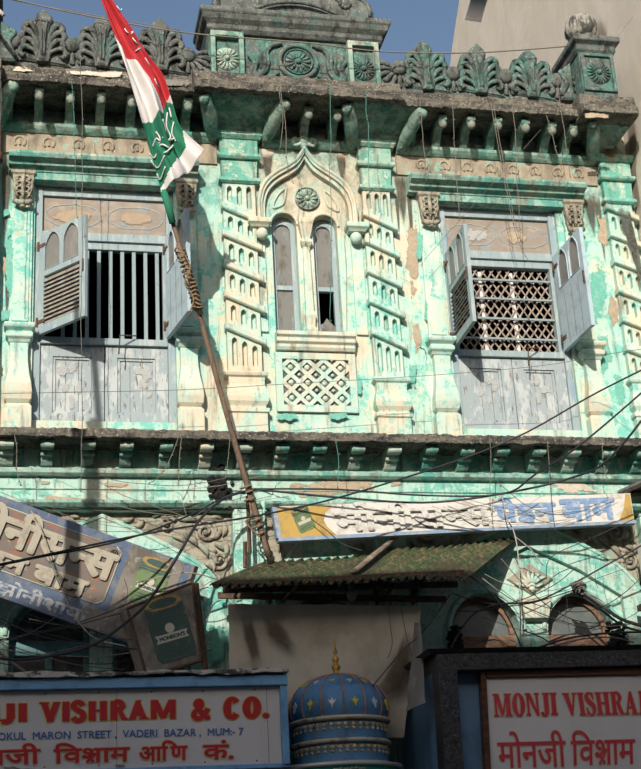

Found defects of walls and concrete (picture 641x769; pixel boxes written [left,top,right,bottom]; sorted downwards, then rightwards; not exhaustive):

peeling [405,220,423,294]
peeling [597,214,609,255]
peeling [590,264,619,326]
peeling [412,302,428,354]
peeling [409,364,417,387]
peeling [599,335,626,405]
damp [244,623,258,656]